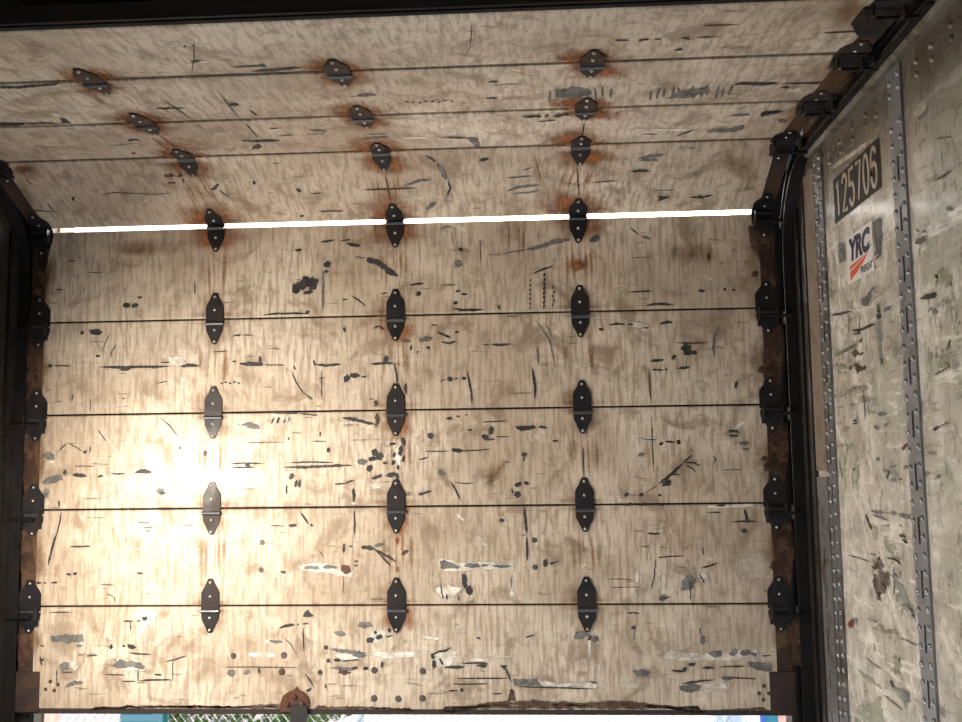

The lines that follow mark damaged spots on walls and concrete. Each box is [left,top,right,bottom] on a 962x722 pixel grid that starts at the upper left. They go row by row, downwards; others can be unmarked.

rust [119,112,208,175]
rust [351,141,413,242]
rust [548,98,612,236]
rust [185,208,235,246]
rust [758,317,785,385]
rust [23,431,37,494]
rust [761,415,789,484]
rust [21,529,36,588]
rust [770,515,795,587]
rust [17,626,33,668]